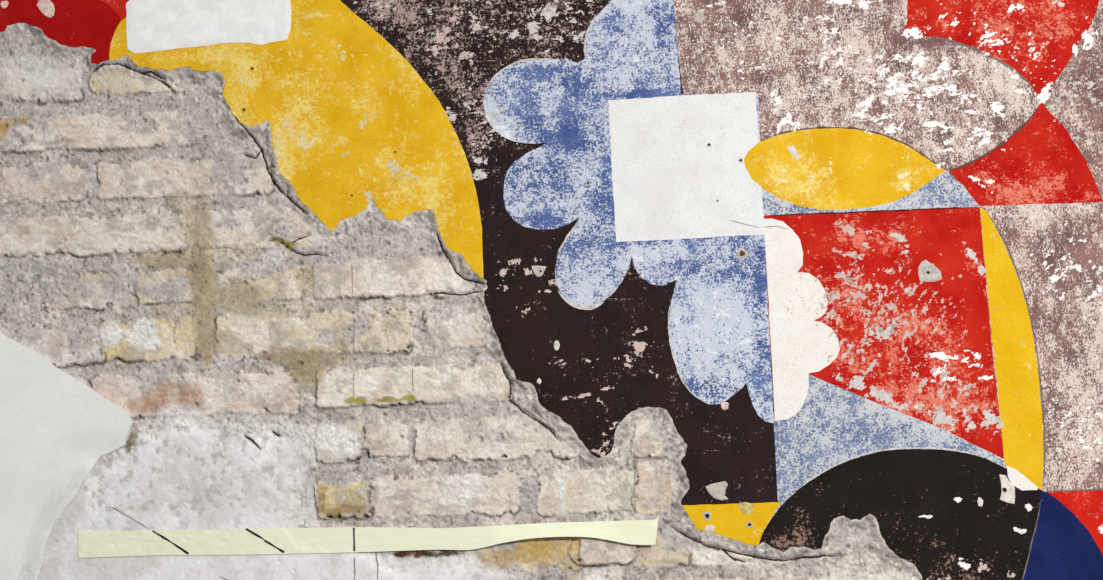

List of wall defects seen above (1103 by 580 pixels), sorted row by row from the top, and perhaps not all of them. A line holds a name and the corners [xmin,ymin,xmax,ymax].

peeling [409,0,609,180]
peeling [692,0,1103,169]
peeling [495,258,558,293]
peeling [1025,220,1103,327]
peeling [613,326,652,369]
spalling [782,221,1004,439]
peeling [1047,392,1103,468]
crack [110,506,147,528]
spalling [705,481,754,516]
spalling [999,474,1032,511]
crack [354,554,379,580]
peeling [958,557,990,573]